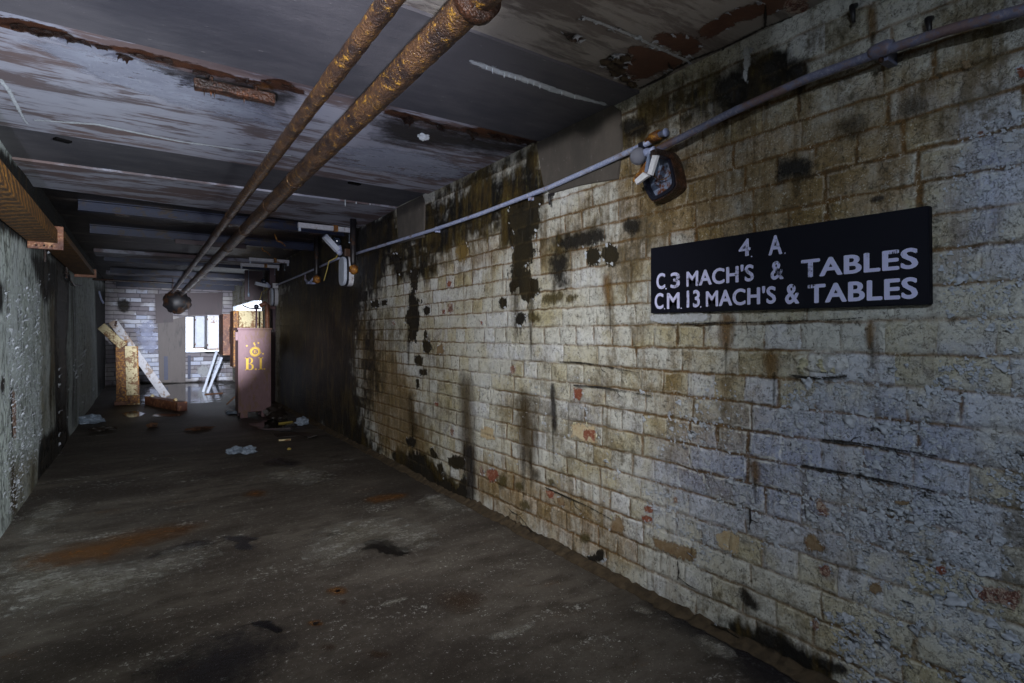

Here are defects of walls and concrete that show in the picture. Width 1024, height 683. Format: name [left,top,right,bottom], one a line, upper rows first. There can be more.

peeling [599,0,787,88]
damp [388,253,403,276]
damp [542,228,606,304]
damp [406,379,475,510]
peeling [642,347,1024,683]